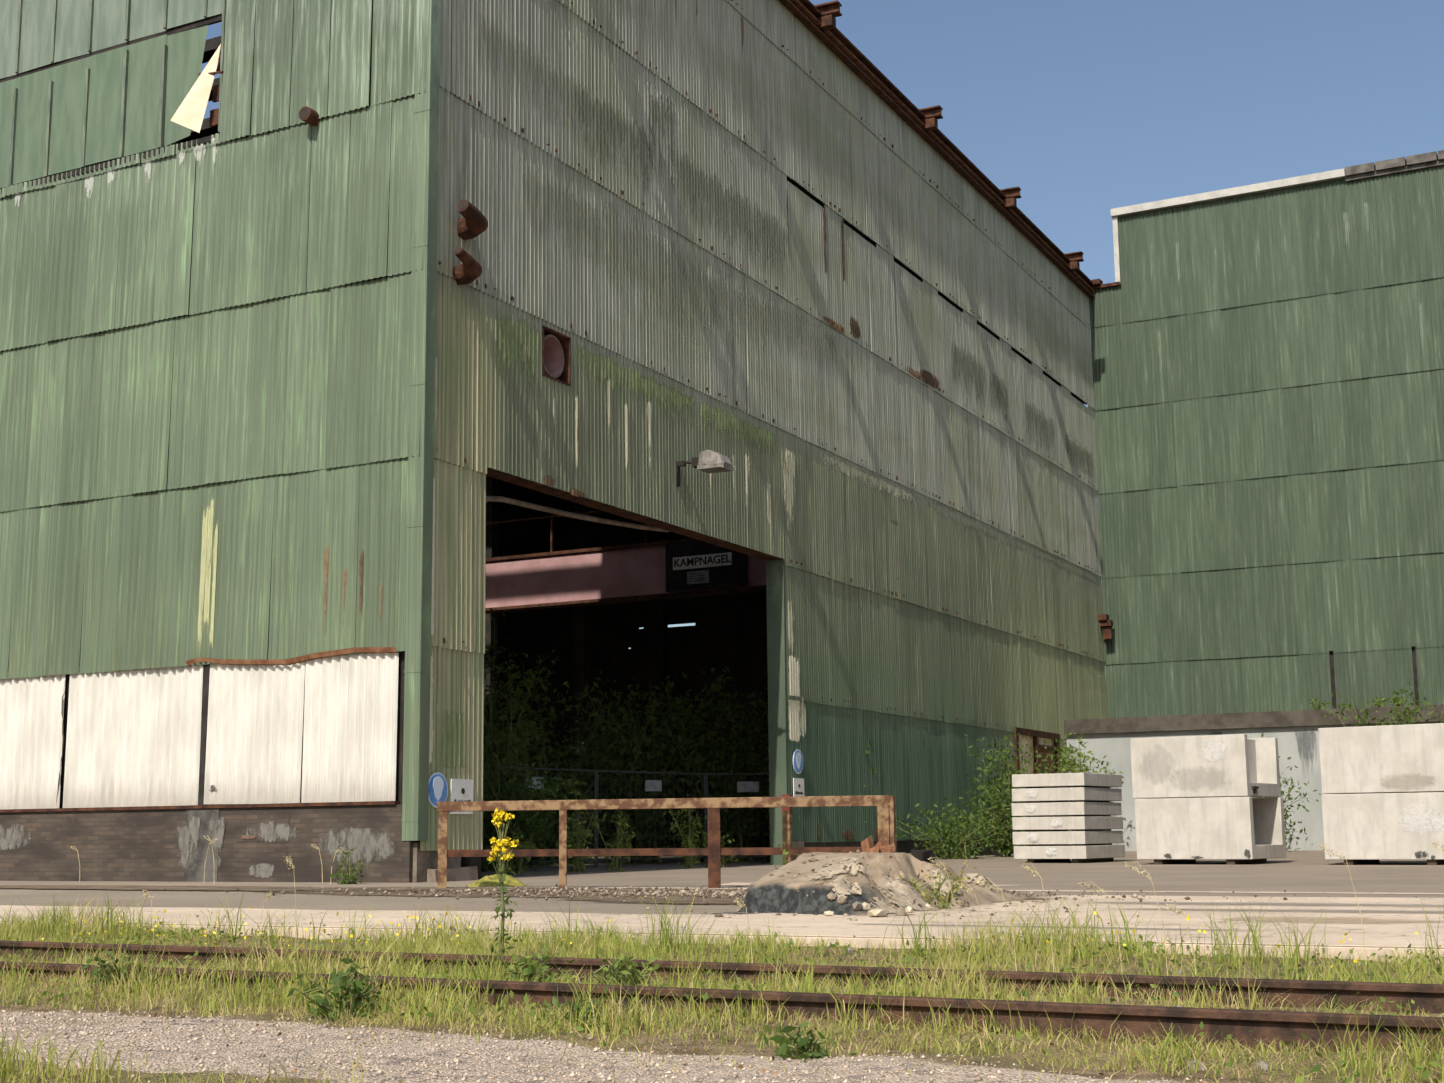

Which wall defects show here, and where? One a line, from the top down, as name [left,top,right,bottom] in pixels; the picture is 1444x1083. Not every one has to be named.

corrosion [824,317,860,339]
corrosion [907,366,939,389]